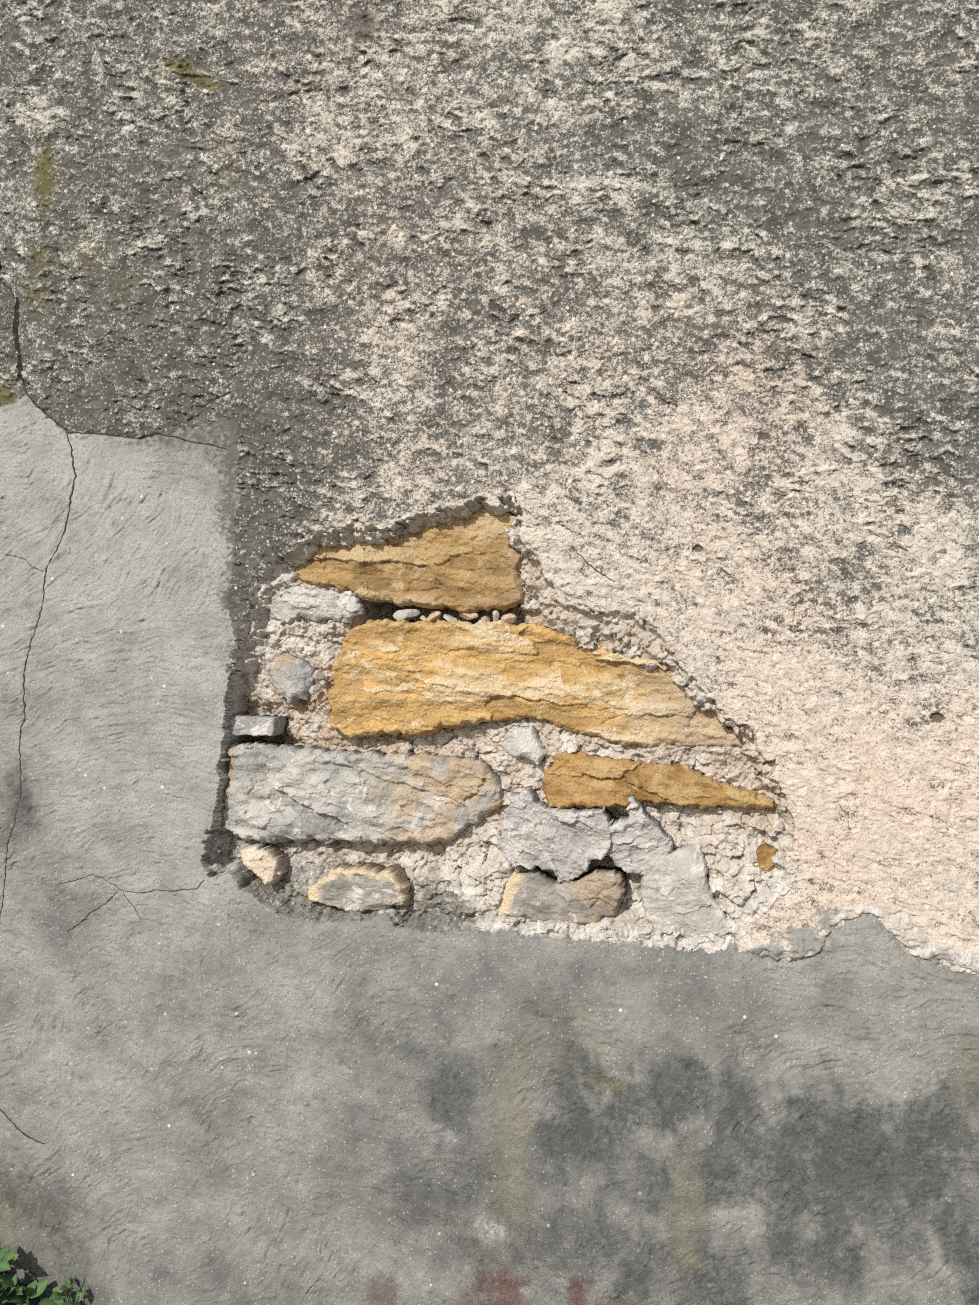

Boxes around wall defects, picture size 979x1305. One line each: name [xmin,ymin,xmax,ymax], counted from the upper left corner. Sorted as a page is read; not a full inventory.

crack [0,280,226,913]
spalling [201,494,979,976]
crack [57,874,204,932]
crack [0,1110,45,1144]
leakage [470,1205,514,1255]
leakage [505,1055,979,1305]